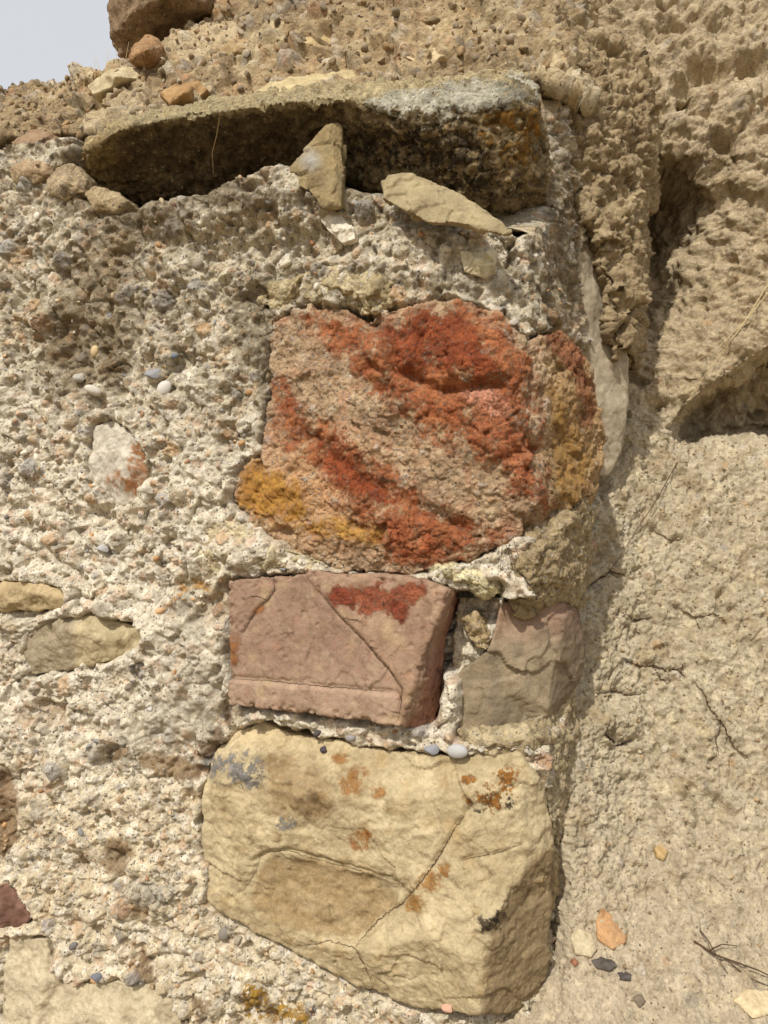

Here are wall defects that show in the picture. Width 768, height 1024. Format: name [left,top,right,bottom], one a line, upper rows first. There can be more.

crack [677,608,726,628]
crack [602,661,748,758]